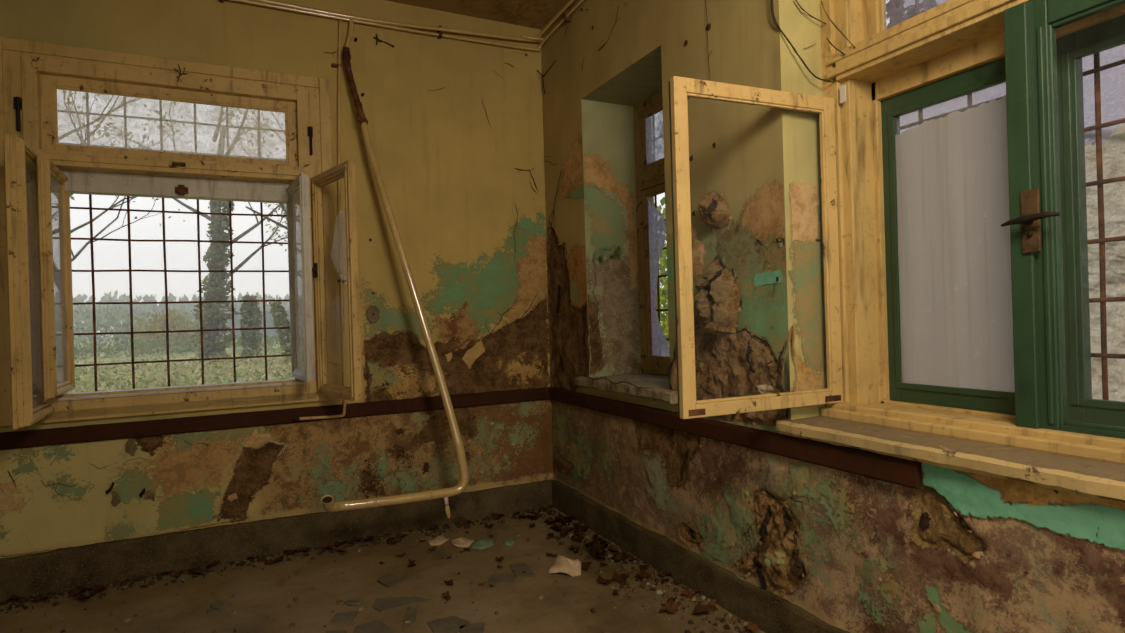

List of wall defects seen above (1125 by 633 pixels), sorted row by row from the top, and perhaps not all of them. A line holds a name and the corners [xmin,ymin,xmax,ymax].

spalling [359,210,605,456]
crack [514,156,562,262]
peeling [557,132,638,291]
peeling [666,232,678,413]
spalling [691,179,826,401]
spalling [1,426,286,524]
spalling [633,420,709,491]
spalling [700,408,788,427]
spalling [674,455,972,633]
peeling [908,462,1125,564]